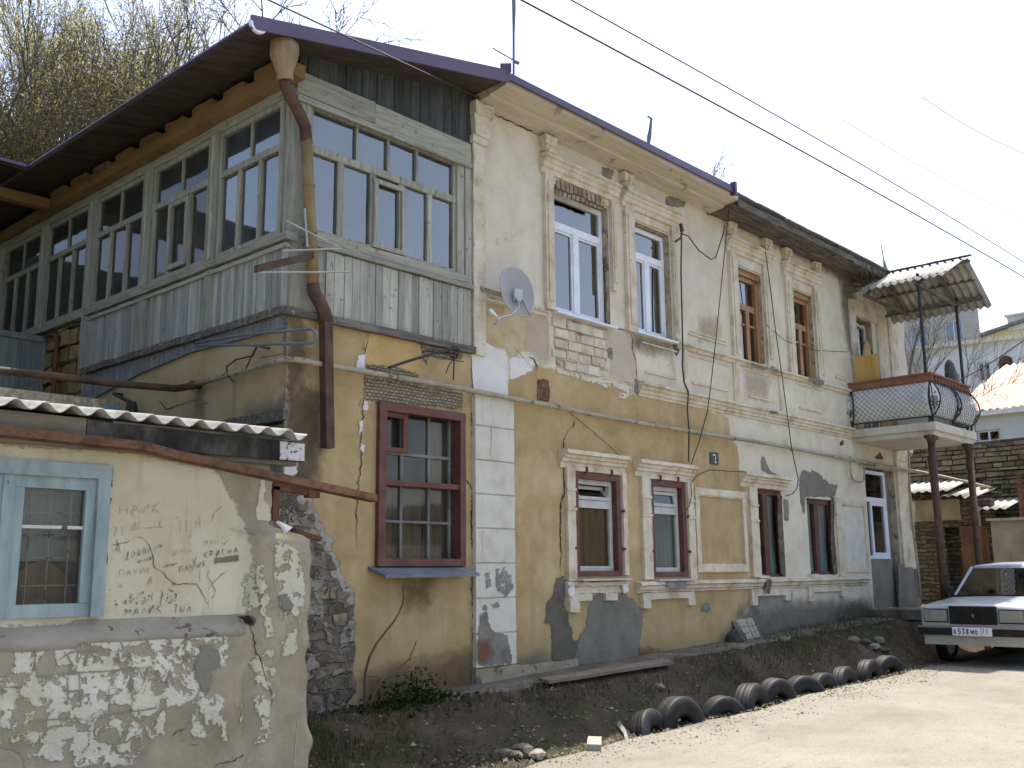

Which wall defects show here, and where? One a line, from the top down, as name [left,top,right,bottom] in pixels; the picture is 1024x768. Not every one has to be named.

flaking render [486,258,638,400]
crack [355,335,393,549]
peeling [0,479,356,768]
crack [134,537,229,610]
peeling [478,567,514,666]